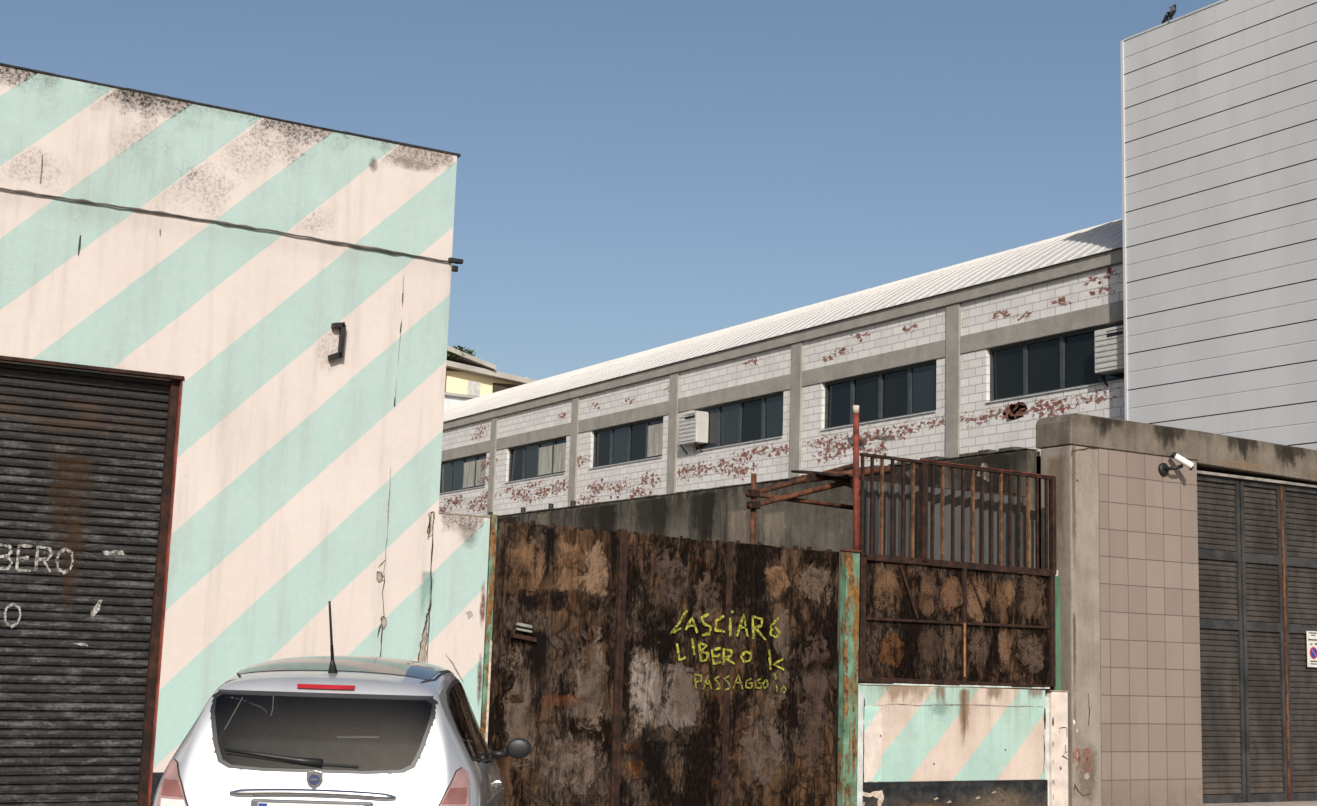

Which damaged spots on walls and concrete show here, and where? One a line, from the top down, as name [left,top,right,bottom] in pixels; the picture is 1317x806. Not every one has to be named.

leakage [0,66,37,84]
leakage [106,88,192,116]
leakage [261,119,333,141]
peeling [1046,267,1119,307]
peeling [990,310,1031,321]
leakage [1091,416,1122,434]
leakage [1155,425,1184,446]
peeling [439,387,1124,513]
leakage [1228,437,1257,459]
leakage [1275,444,1305,466]
crack [377,469,391,657]
spalling [418,609,429,663]